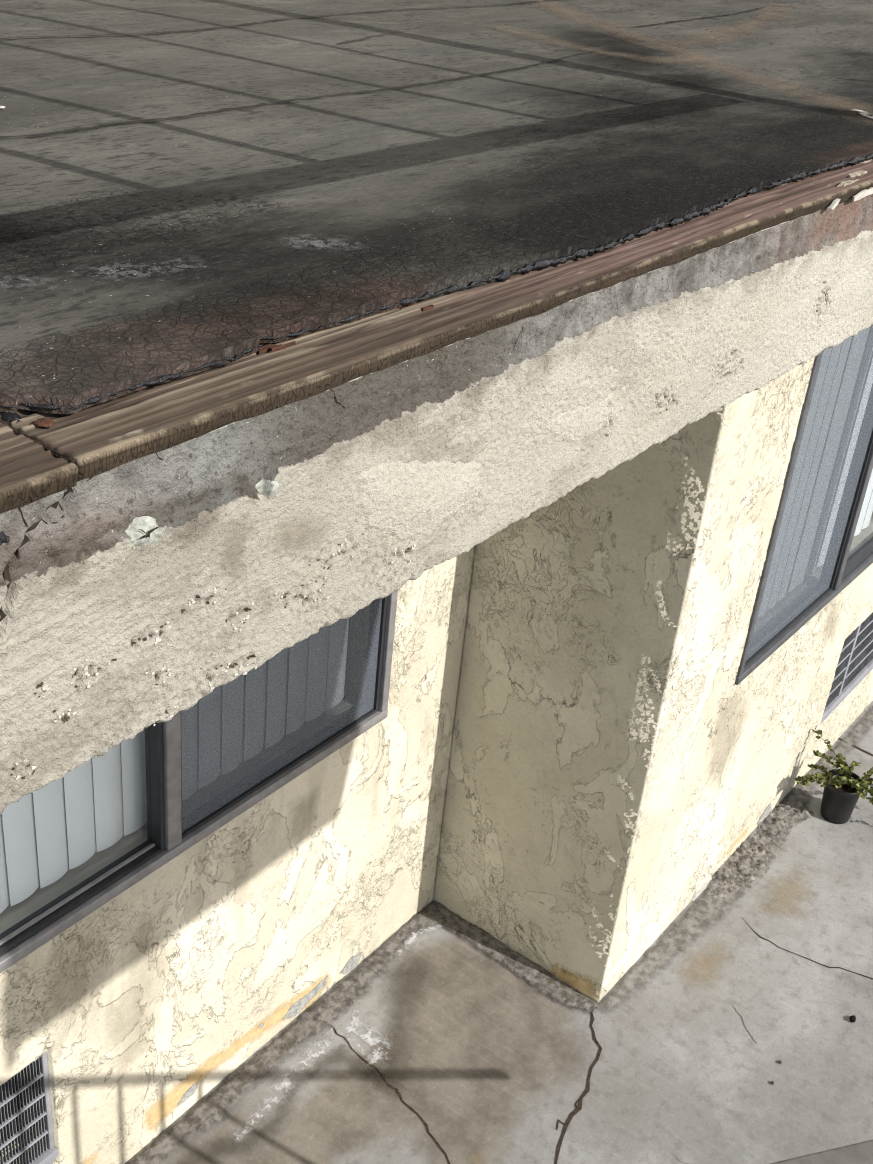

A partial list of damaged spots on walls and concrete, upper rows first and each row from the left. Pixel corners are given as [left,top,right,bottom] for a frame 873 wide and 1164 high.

peeling [0,159,873,587]
crack [0,476,93,622]
spalling [131,621,171,646]
spalling [274,533,366,609]
leakage [398,924,441,952]
crack [742,917,873,979]
leakage [211,1011,394,1154]
crack [331,1025,450,1164]
crack [555,1010,602,1164]